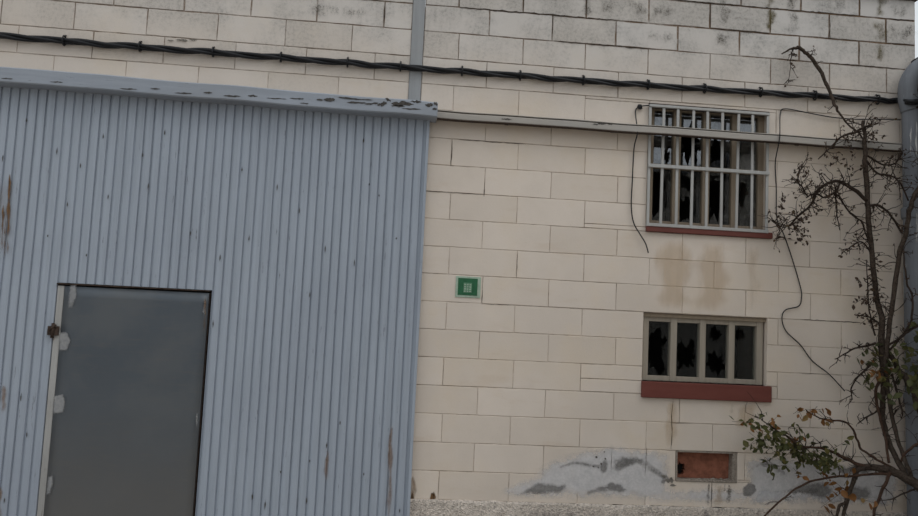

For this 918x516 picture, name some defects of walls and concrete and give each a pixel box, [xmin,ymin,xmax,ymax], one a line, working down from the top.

corrosion [2,176,11,249]